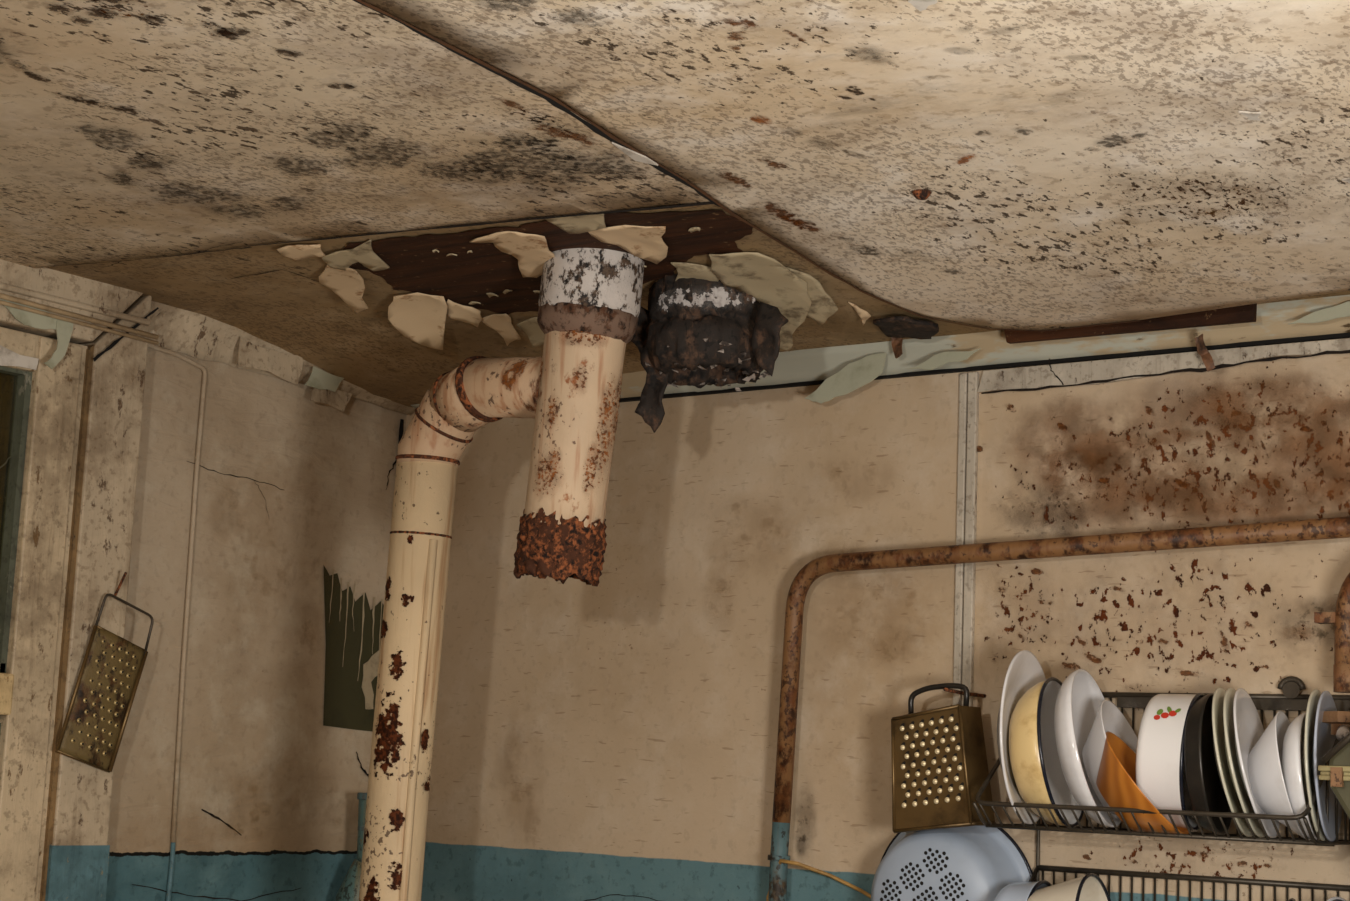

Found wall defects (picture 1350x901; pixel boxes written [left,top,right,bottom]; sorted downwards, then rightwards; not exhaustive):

water stain [0,42,138,114]
water stain [80,125,315,218]
crack [57,0,720,282]
water stain [1085,134,1144,151]
peeling [277,210,871,352]
peeling [805,353,887,404]
peeling [908,348,981,370]
crack [386,419,404,489]
corrosion [995,358,1350,531]
peeling [323,565,384,732]
corrosion [984,558,1303,693]